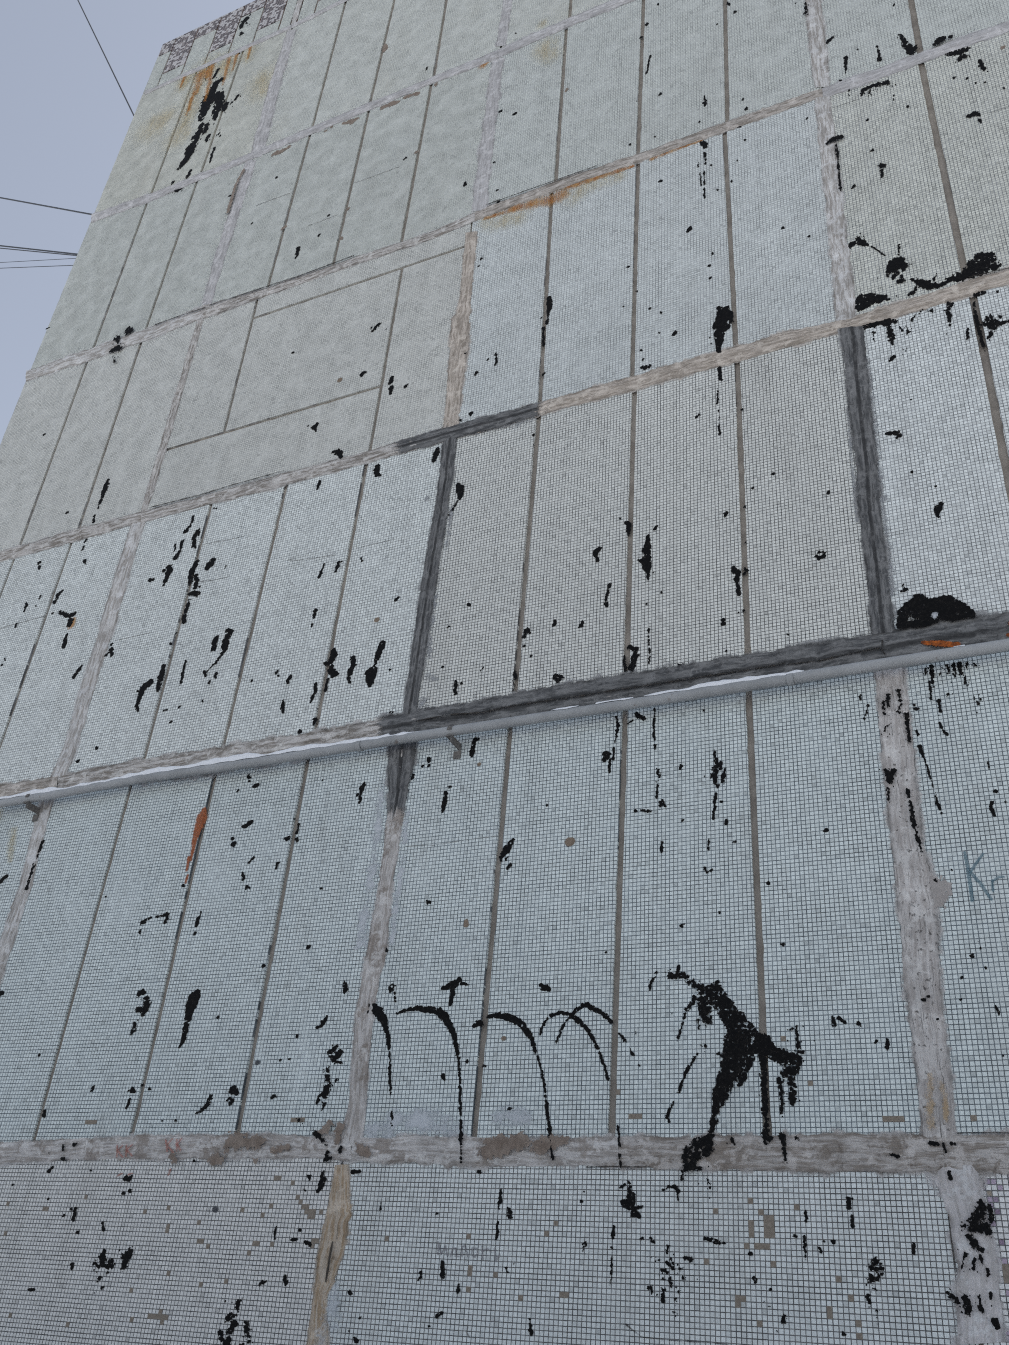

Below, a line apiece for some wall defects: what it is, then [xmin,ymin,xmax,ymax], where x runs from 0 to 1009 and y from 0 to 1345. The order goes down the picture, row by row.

rust [180,47,251,111]
rust [184,807,207,884]